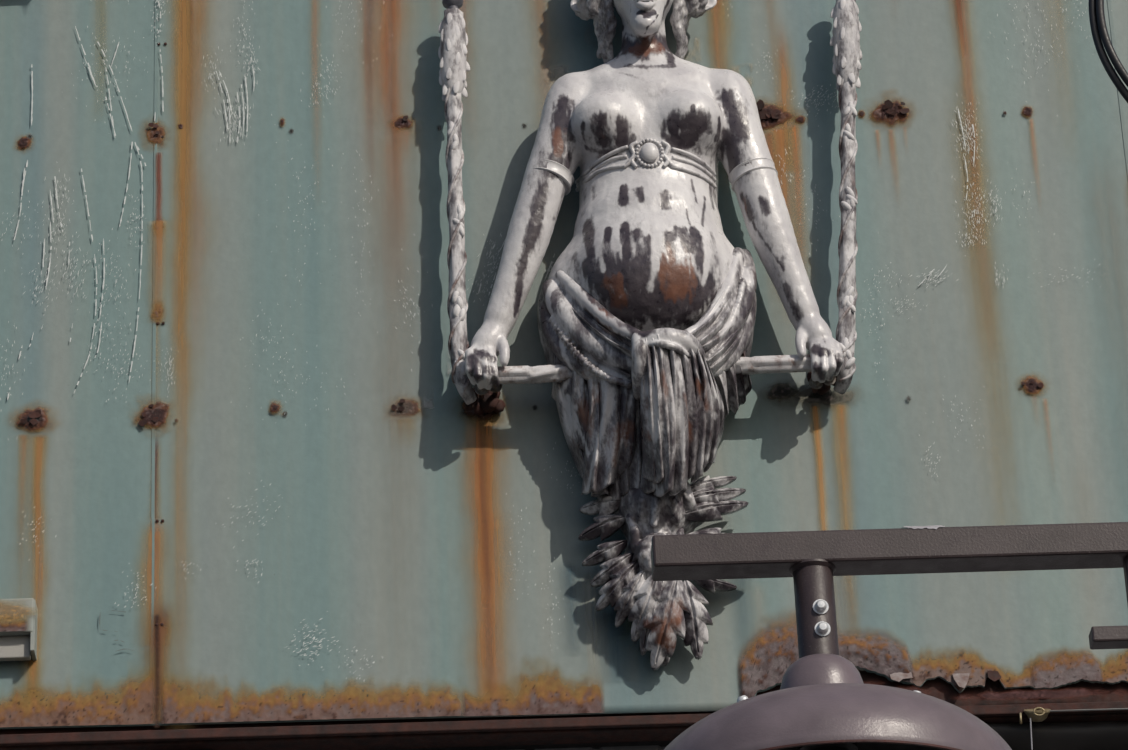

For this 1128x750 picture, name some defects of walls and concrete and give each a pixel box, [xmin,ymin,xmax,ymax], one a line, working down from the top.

rust [955,0,977,145]
rust [391,115,413,130]
rust [756,57,806,209]
rust [858,100,910,126]
rust [145,0,200,366]
rust [1021,375,1045,395]
rust [0,395,603,727]
rust [739,620,799,698]
rust [838,633,1128,700]